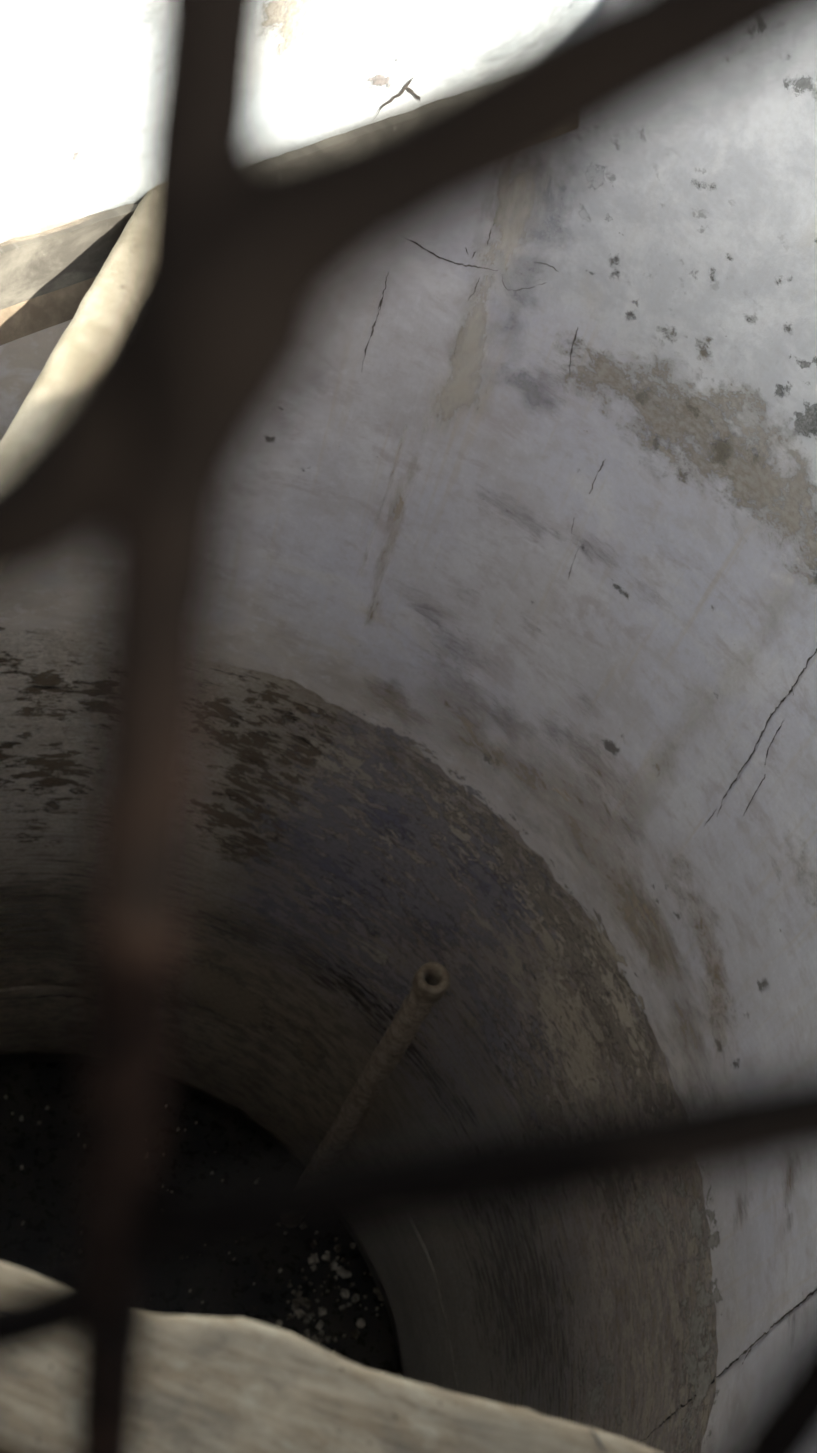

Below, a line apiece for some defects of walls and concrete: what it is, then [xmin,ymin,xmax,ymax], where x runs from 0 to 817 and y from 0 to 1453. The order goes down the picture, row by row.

crack [704,648,817,826]